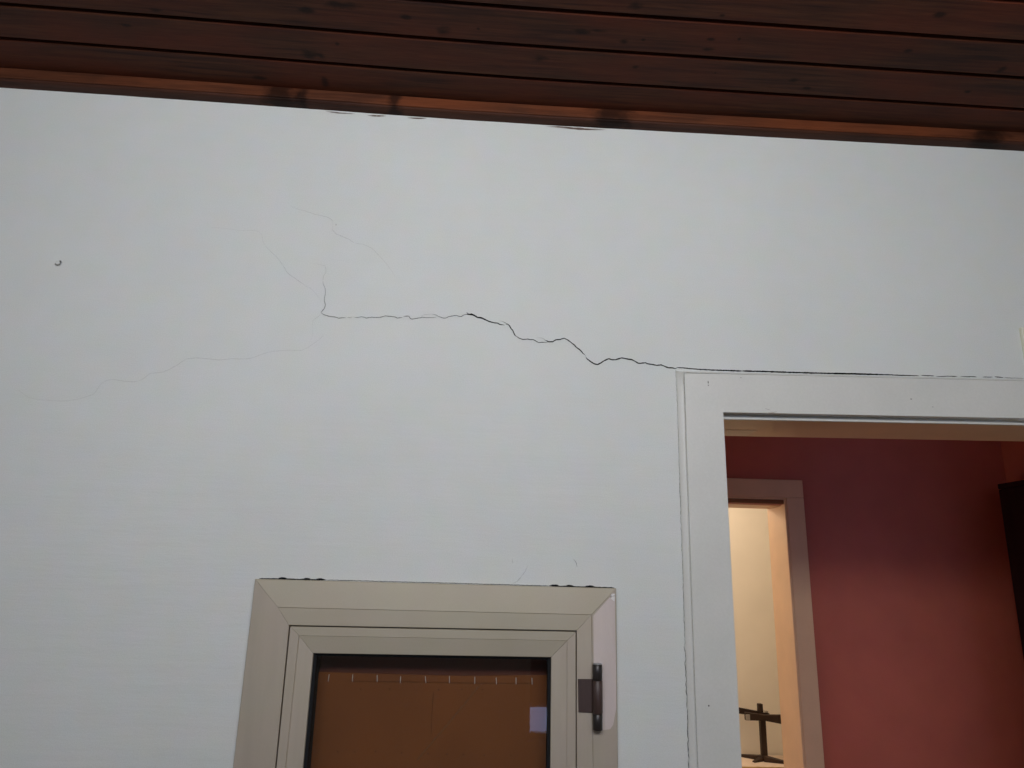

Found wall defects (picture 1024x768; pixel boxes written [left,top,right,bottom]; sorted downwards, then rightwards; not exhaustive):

crack [321,299,1006,378]